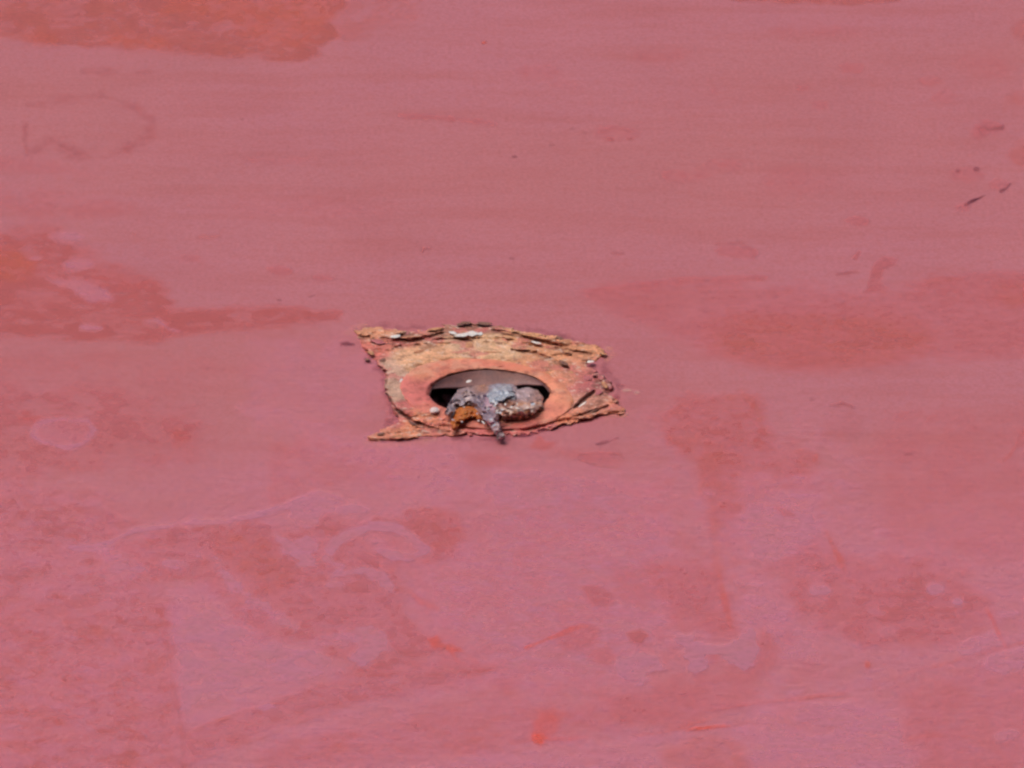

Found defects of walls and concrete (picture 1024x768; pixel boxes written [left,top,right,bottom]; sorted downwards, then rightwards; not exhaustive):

spalling [354,321,626,442]